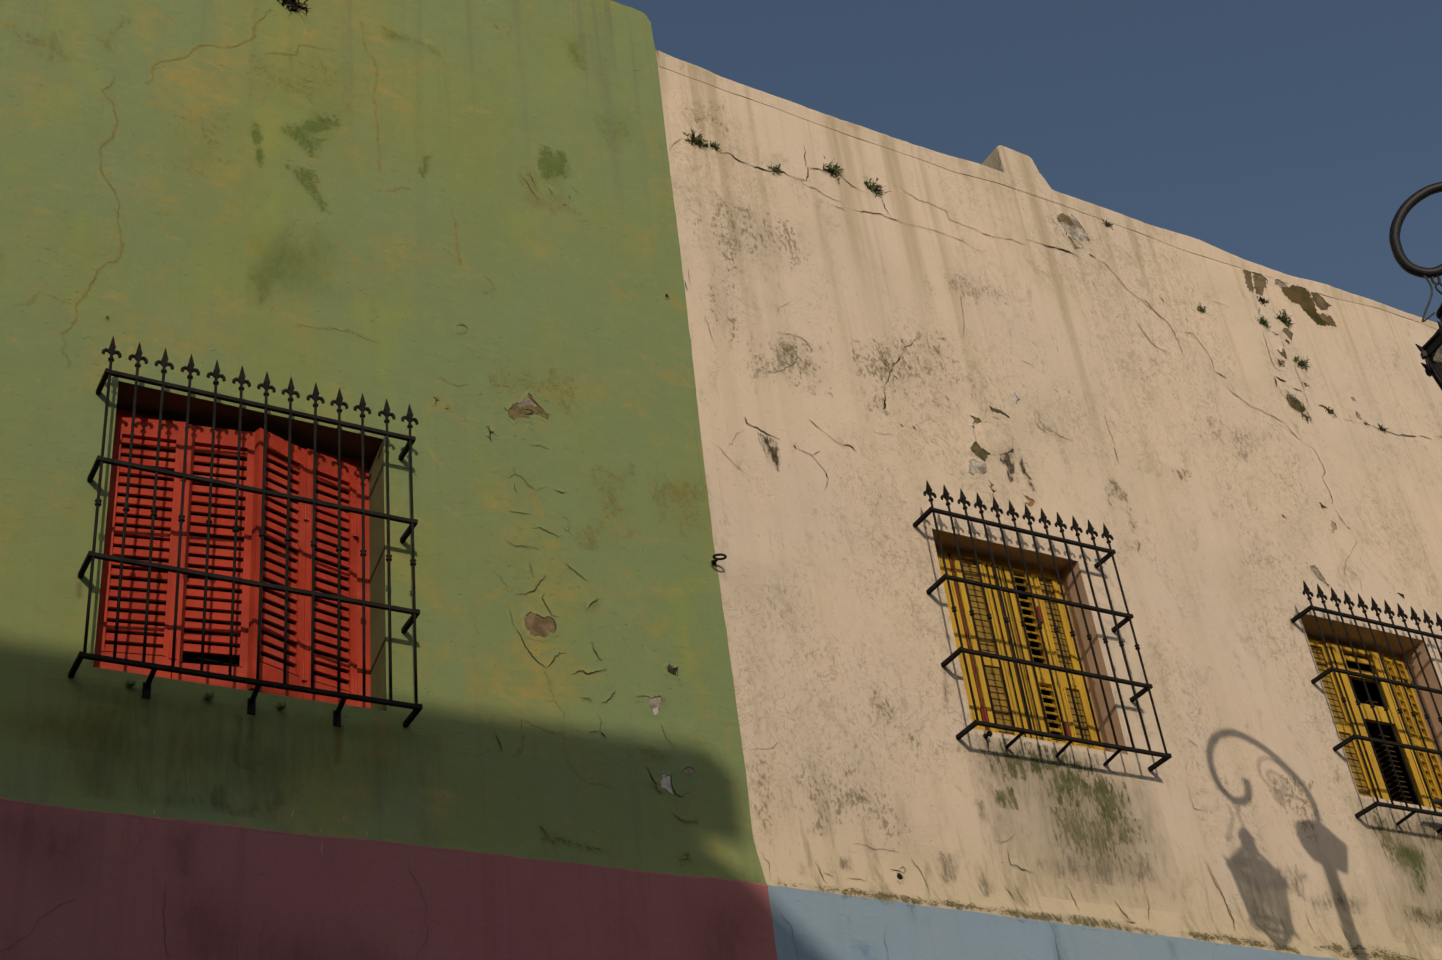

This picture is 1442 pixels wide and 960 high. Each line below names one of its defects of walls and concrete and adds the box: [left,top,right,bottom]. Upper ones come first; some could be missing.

crack [17,9,322,365]
spalling [1054,211,1092,250]
spalling [1240,268,1339,330]
crack [719,146,1442,592]
spalling [1274,326,1295,366]
peeling [502,389,553,425]
spalling [965,389,1021,479]
peeling [519,595,561,642]
peeling [637,660,682,719]